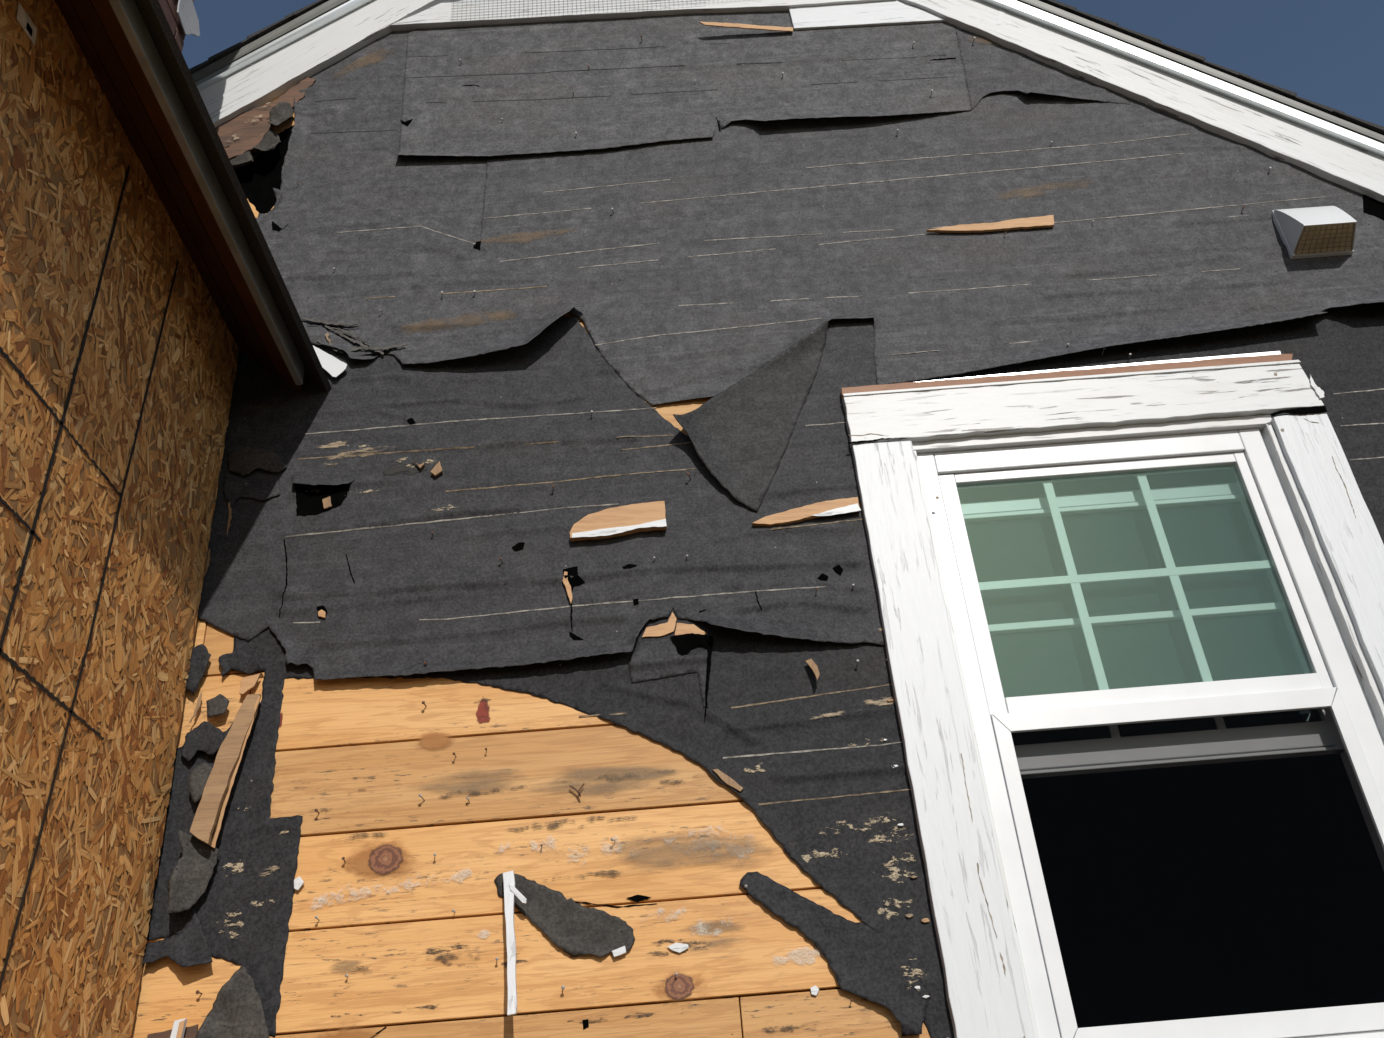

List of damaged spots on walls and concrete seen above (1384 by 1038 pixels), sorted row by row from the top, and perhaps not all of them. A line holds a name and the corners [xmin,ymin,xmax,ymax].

peeling [321,441,376,465]
peeling [360,458,443,493]
peeling [865,697,895,705]
damp [565,768,682,792]
peeling [801,812,930,923]
peeling [219,900,275,938]
peeling [612,946,626,958]
peeling [667,943,689,953]
peeling [901,959,930,999]